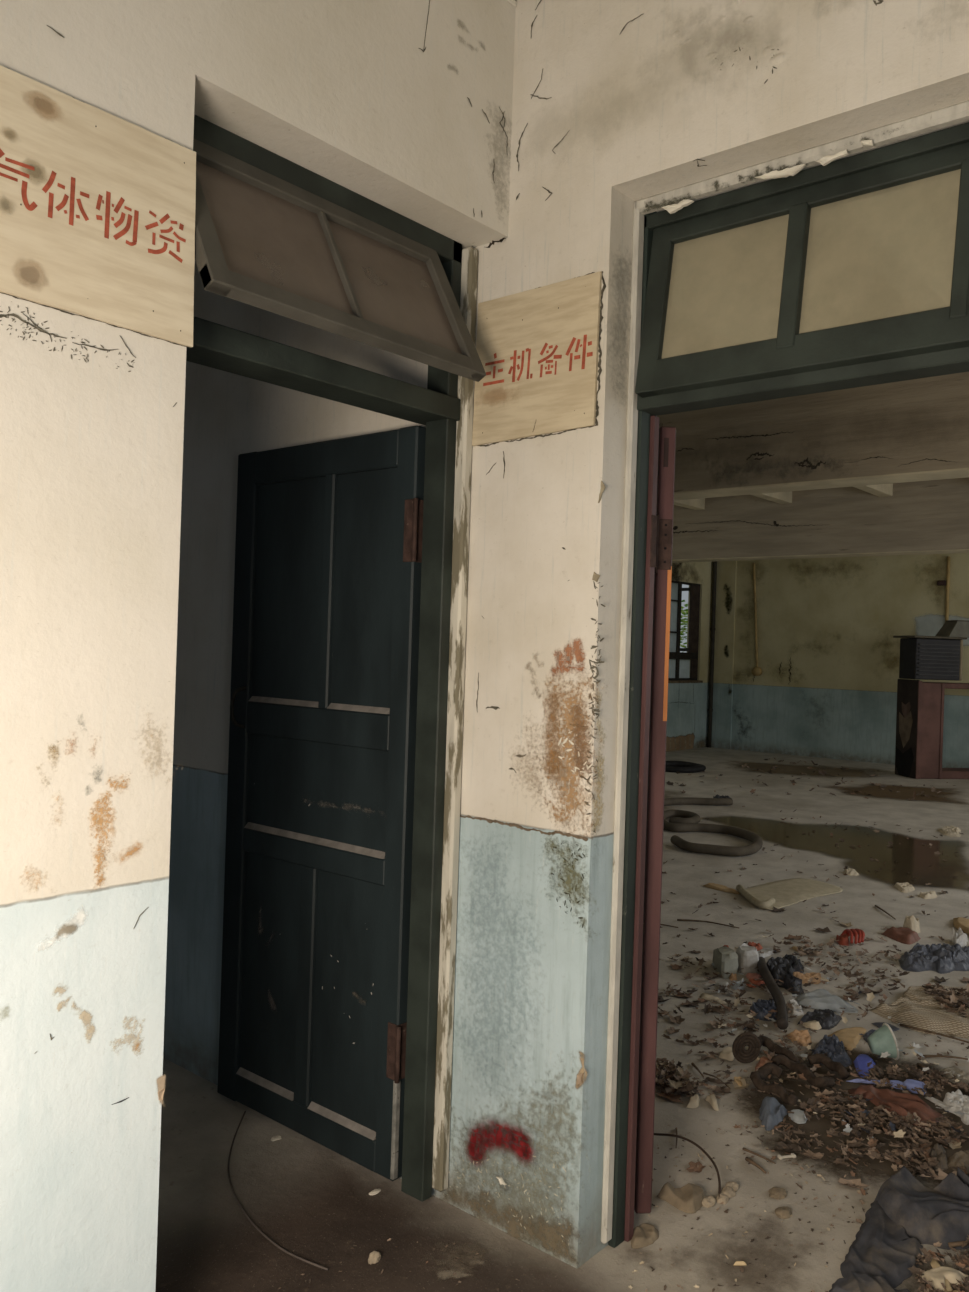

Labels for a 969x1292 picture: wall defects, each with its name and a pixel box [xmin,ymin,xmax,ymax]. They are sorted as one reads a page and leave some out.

peeling [714,137,874,191]
peeling [643,193,694,214]
crack [0,306,136,372]
crack [677,432,826,470]
rust [543,676,603,835]
rust [91,779,140,884]
water stain [545,840,588,928]
peeling [55,987,95,1040]
peeling [114,1018,141,1052]